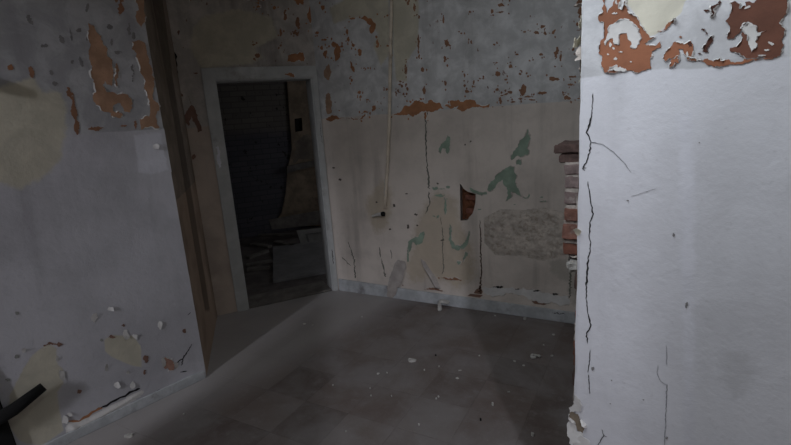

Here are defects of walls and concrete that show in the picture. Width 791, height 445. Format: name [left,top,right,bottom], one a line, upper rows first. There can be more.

peeling [59,0,161,135]
peeling [247,0,389,85]
peeling [383,34,547,121]
peeling [546,0,582,103]
peeling [598,0,790,74]
crack [424,112,444,274]
peeling [460,129,531,221]
crack [569,94,631,393]
flaking render [4,341,73,445]
crack [68,388,140,422]
peeling [567,310,590,445]
crack [657,346,667,445]